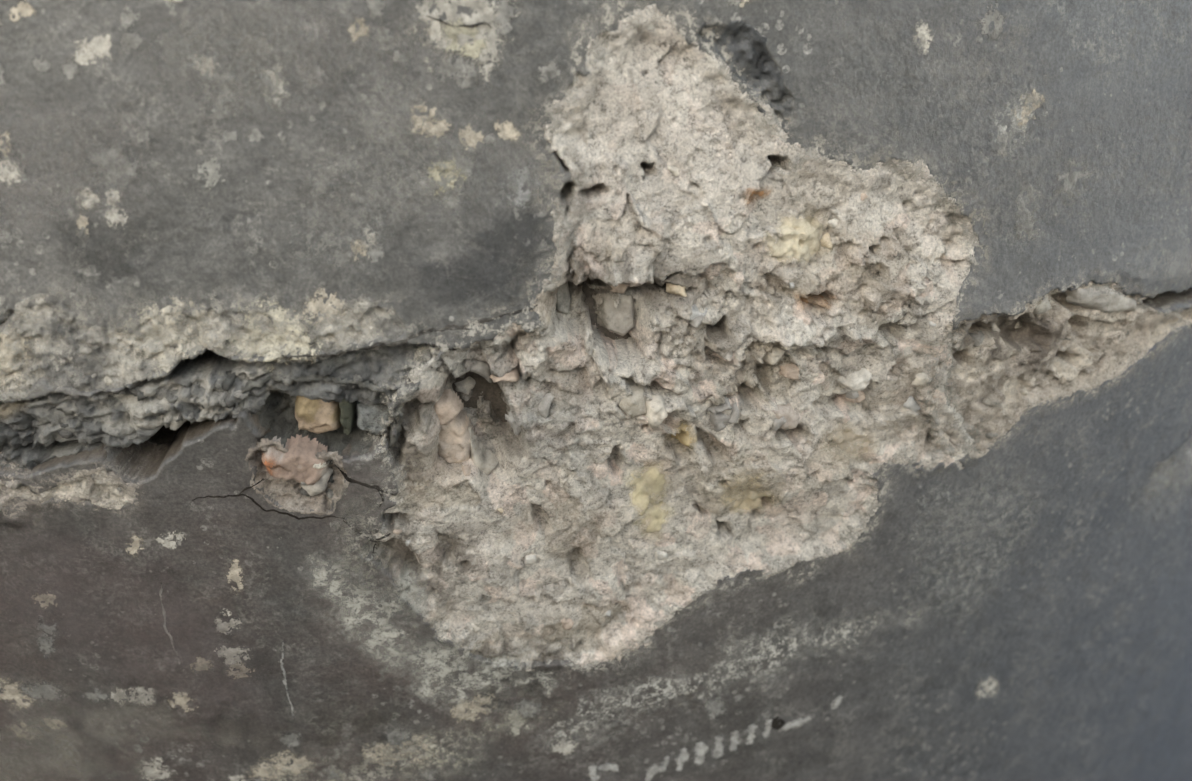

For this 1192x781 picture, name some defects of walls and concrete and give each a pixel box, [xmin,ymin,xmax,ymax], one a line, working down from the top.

peeling [0,1,35,30]
peeling [32,0,521,190]
peeling [74,127,151,249]
spalling [0,288,405,412]
spalling [245,0,1192,673]
spalling [0,444,158,515]
peeling [125,532,186,558]
peeling [226,559,244,595]
crack [192,461,394,562]
peeling [188,609,255,679]
peeling [450,692,541,736]
peeling [550,736,579,755]